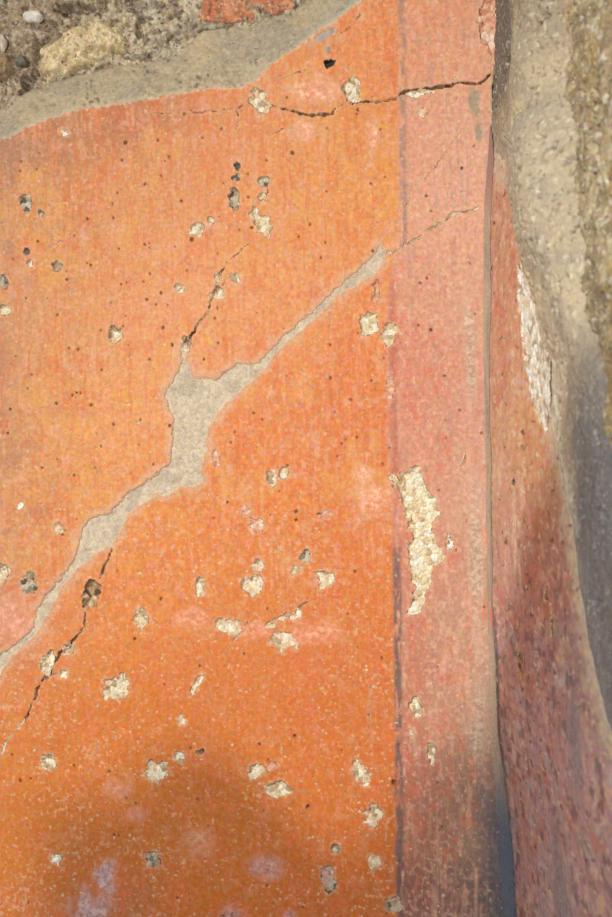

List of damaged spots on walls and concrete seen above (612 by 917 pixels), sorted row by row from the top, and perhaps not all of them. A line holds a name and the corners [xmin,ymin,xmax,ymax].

spalling [476,0,496,74]
crack [152,67,492,138]
crack [183,243,250,344]
spalling [517,264,551,431]
spalling [80,579,102,610]
crack [99,548,112,581]
crack [233,602,309,641]
spalling [389,465,454,615]
crack [0,611,86,757]
spalling [103,672,130,700]
crack [190,672,205,695]
spalling [247,761,292,798]